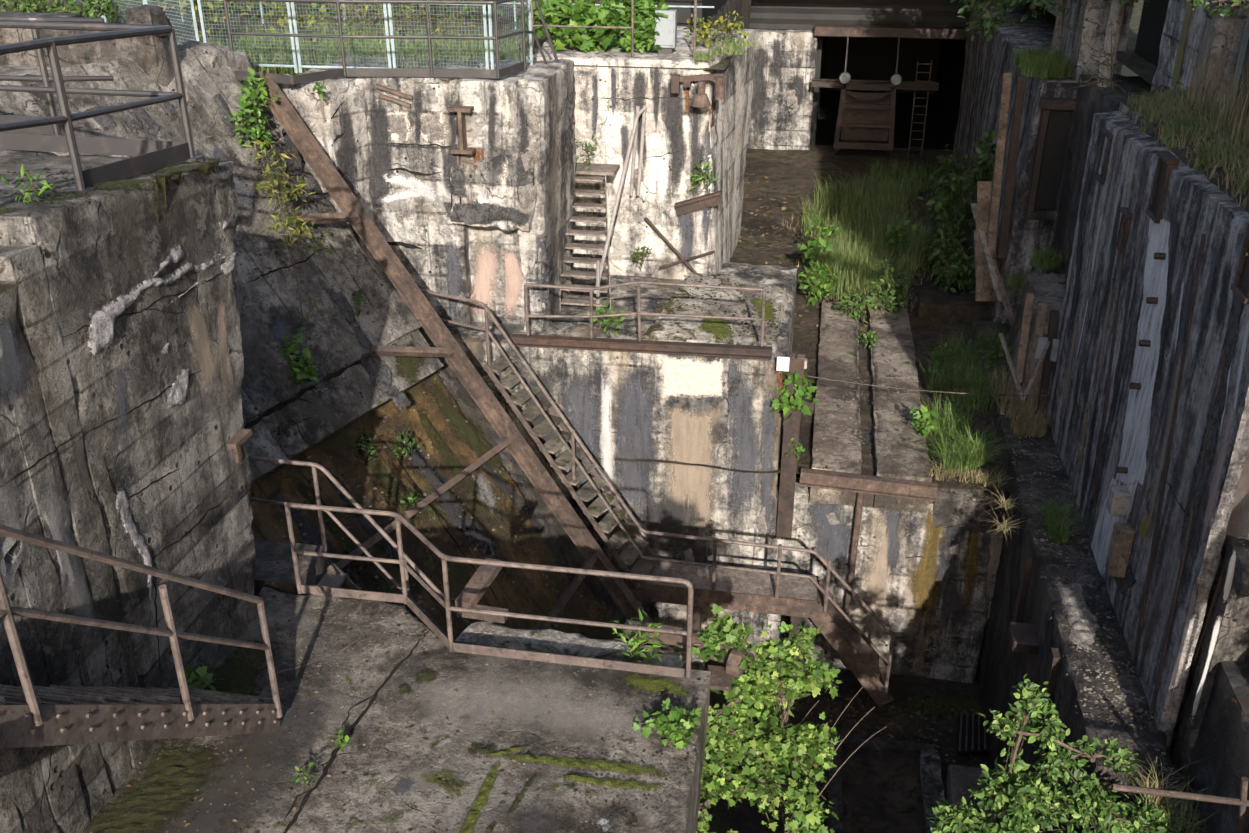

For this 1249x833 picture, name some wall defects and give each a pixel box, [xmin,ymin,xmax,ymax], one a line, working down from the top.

damp [87,245,236,408]
corrosion [473,149,484,168]
damp [592,68,718,270]
damp [1068,164,1121,363]
damp [1079,252,1135,512]
damp [1157,216,1231,460]
damp [808,503,852,569]
damp [864,504,1025,644]
damp [1166,318,1249,692]
crack [283,630,430,833]